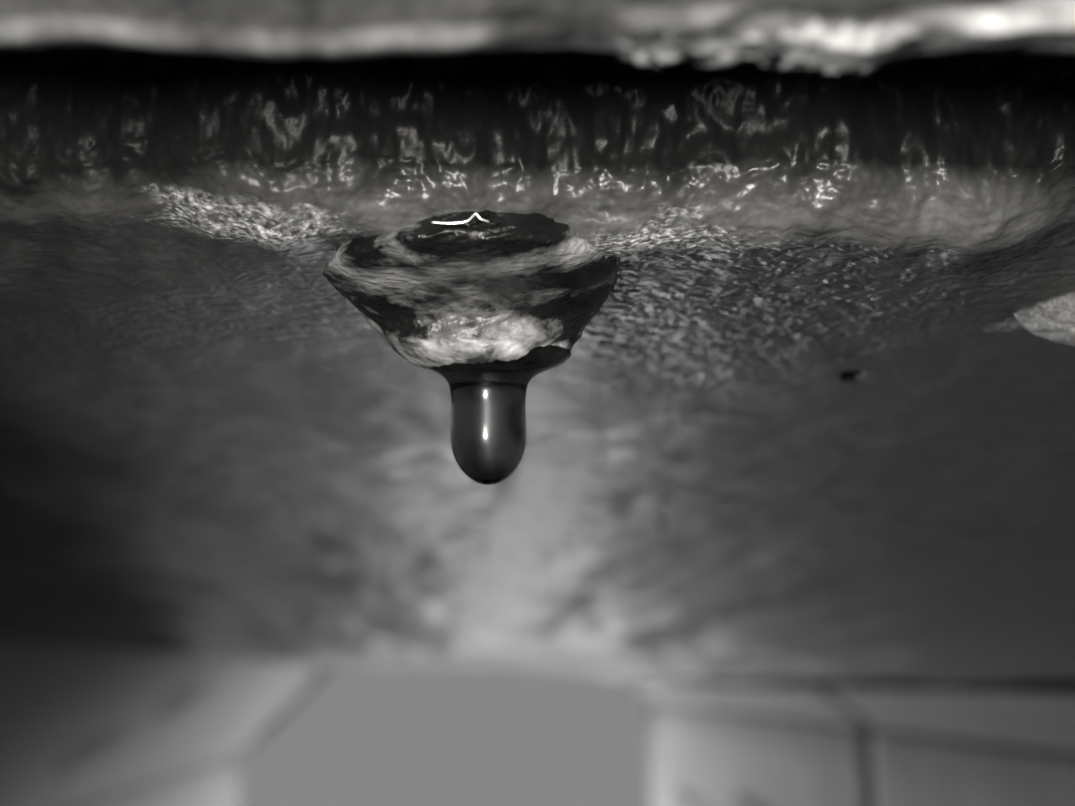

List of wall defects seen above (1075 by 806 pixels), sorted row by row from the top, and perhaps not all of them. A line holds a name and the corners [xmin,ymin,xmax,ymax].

spalling [985,304,1075,345]